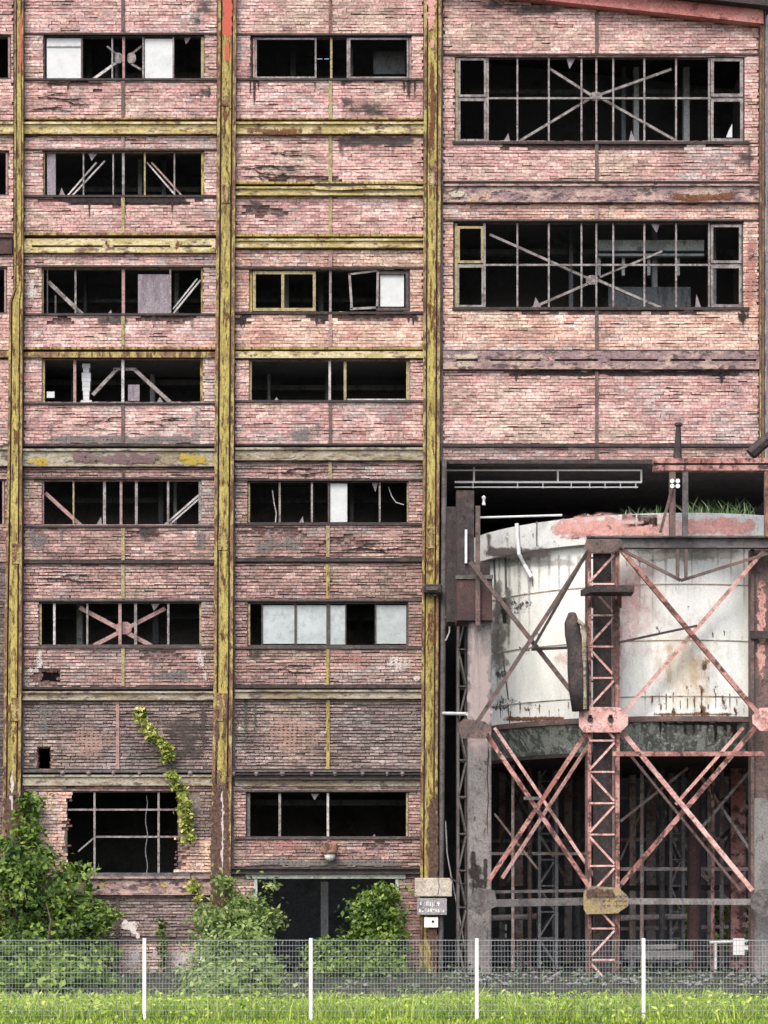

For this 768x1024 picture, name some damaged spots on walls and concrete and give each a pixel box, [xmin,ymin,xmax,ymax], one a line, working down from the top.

peeling [222,0,233,61]
water stain [339,136,413,151]
corrosion [666,190,737,203]
peeling [28,457,48,467]
peeling [179,453,208,465]
peeling [550,514,665,541]
peeling [681,517,756,536]
water stain [494,581,532,651]
corrosion [651,659,737,716]
water stain [659,722,738,742]
water stain [468,851,488,893]